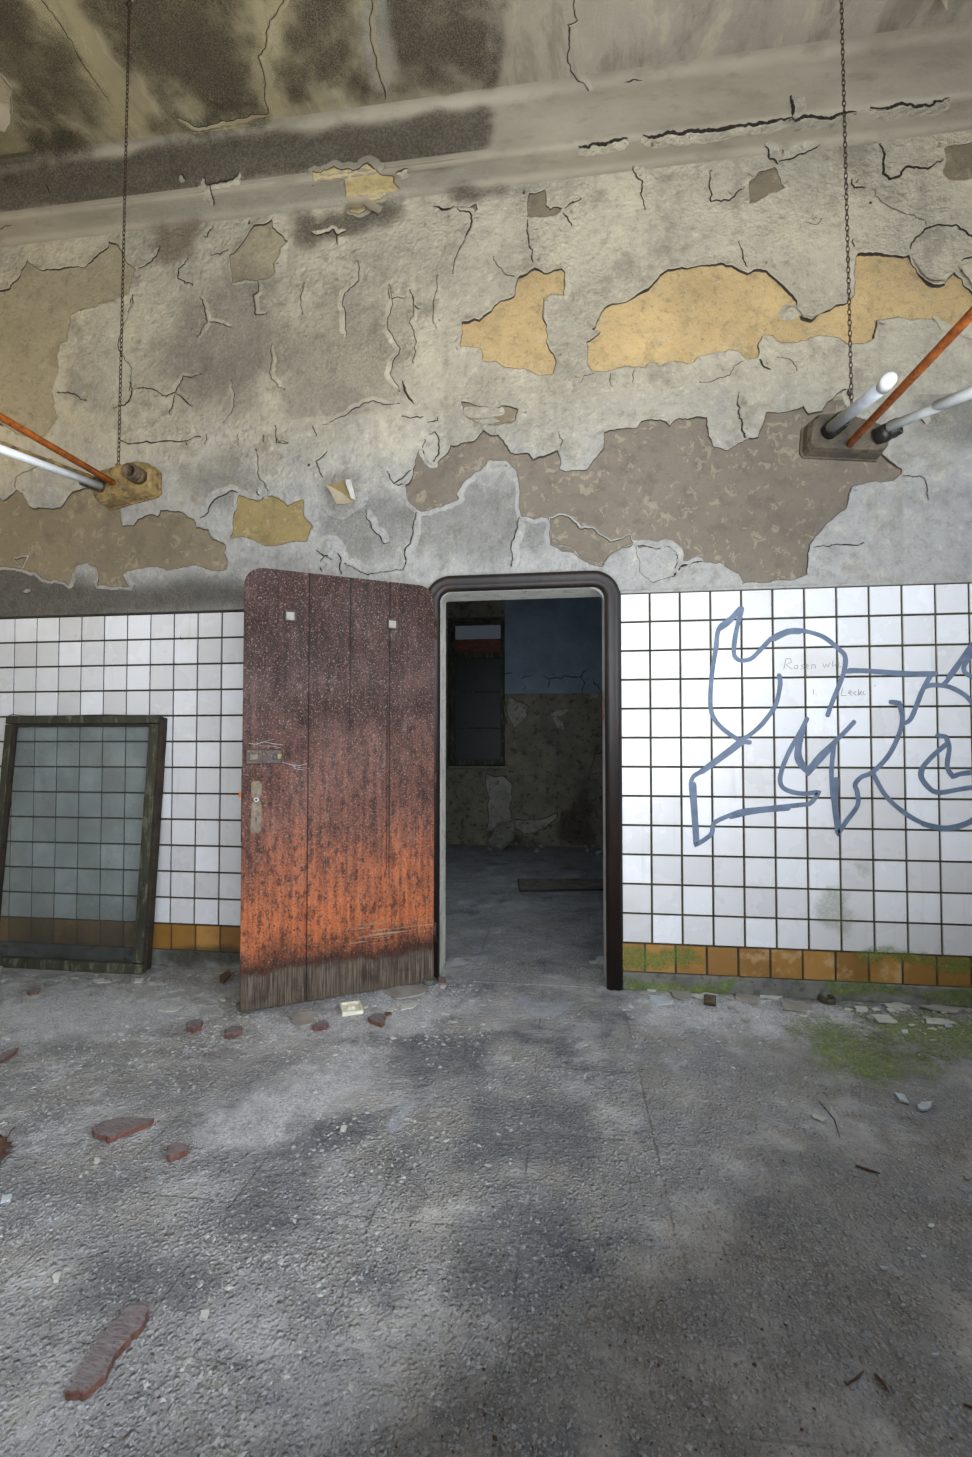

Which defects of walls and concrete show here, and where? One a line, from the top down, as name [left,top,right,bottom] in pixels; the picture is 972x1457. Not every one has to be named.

water stain [0,0,501,210]
peeling [0,233,143,442]
peeling [224,211,295,288]
peeling [520,184,571,224]
peeling [454,226,972,382]
crack [738,239,754,267]
peeling [740,160,793,212]
crack [578,95,972,261]
peeling [934,134,972,188]
peeling [0,482,321,593]
peeling [401,386,908,589]